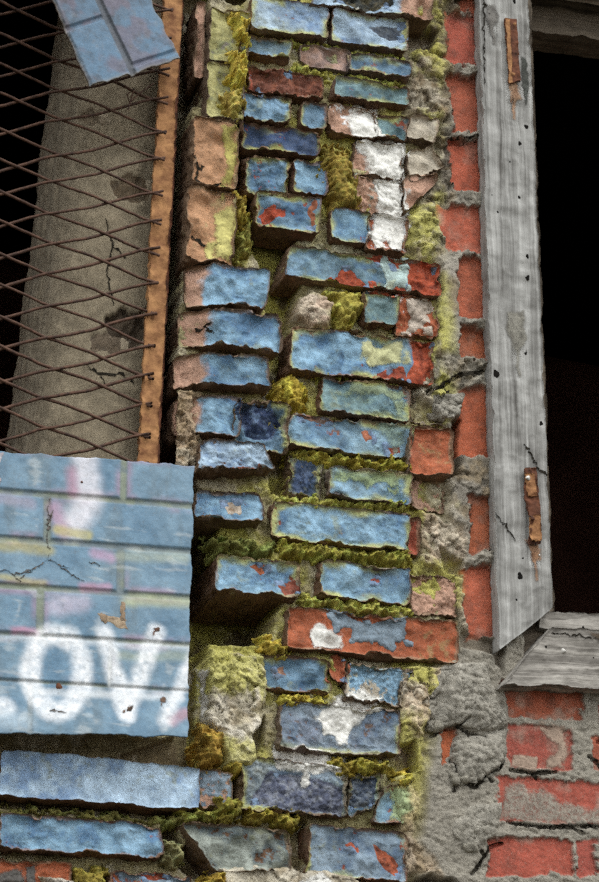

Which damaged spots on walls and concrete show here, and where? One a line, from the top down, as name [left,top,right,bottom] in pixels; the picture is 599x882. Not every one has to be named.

rust [509,82,521,119]
spalling [258,201,285,225]
spalling [306,193,318,231]
spalling [329,255,442,390]
crack [524,444,548,476]
crack [1,498,100,582]
peeling [323,608,413,652]
spalling [141,872,170,882]